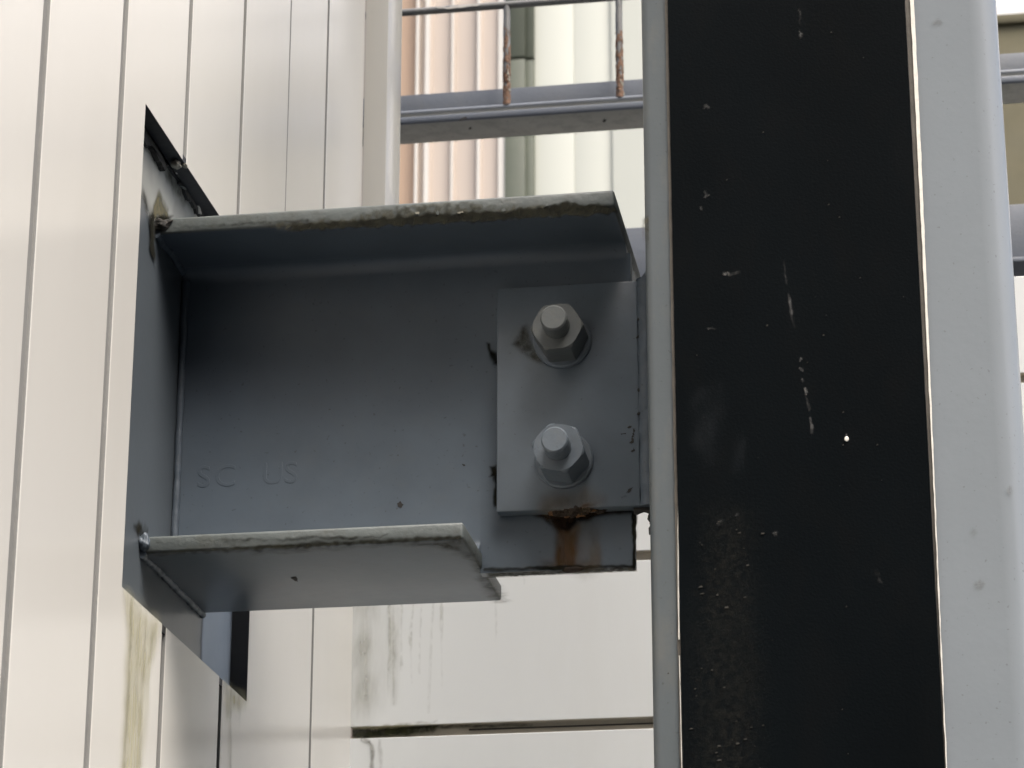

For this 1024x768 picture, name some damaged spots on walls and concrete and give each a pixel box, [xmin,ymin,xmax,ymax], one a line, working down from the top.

rust [503,27,511,105]
rust [615,30,625,97]
rust [536,511,632,566]